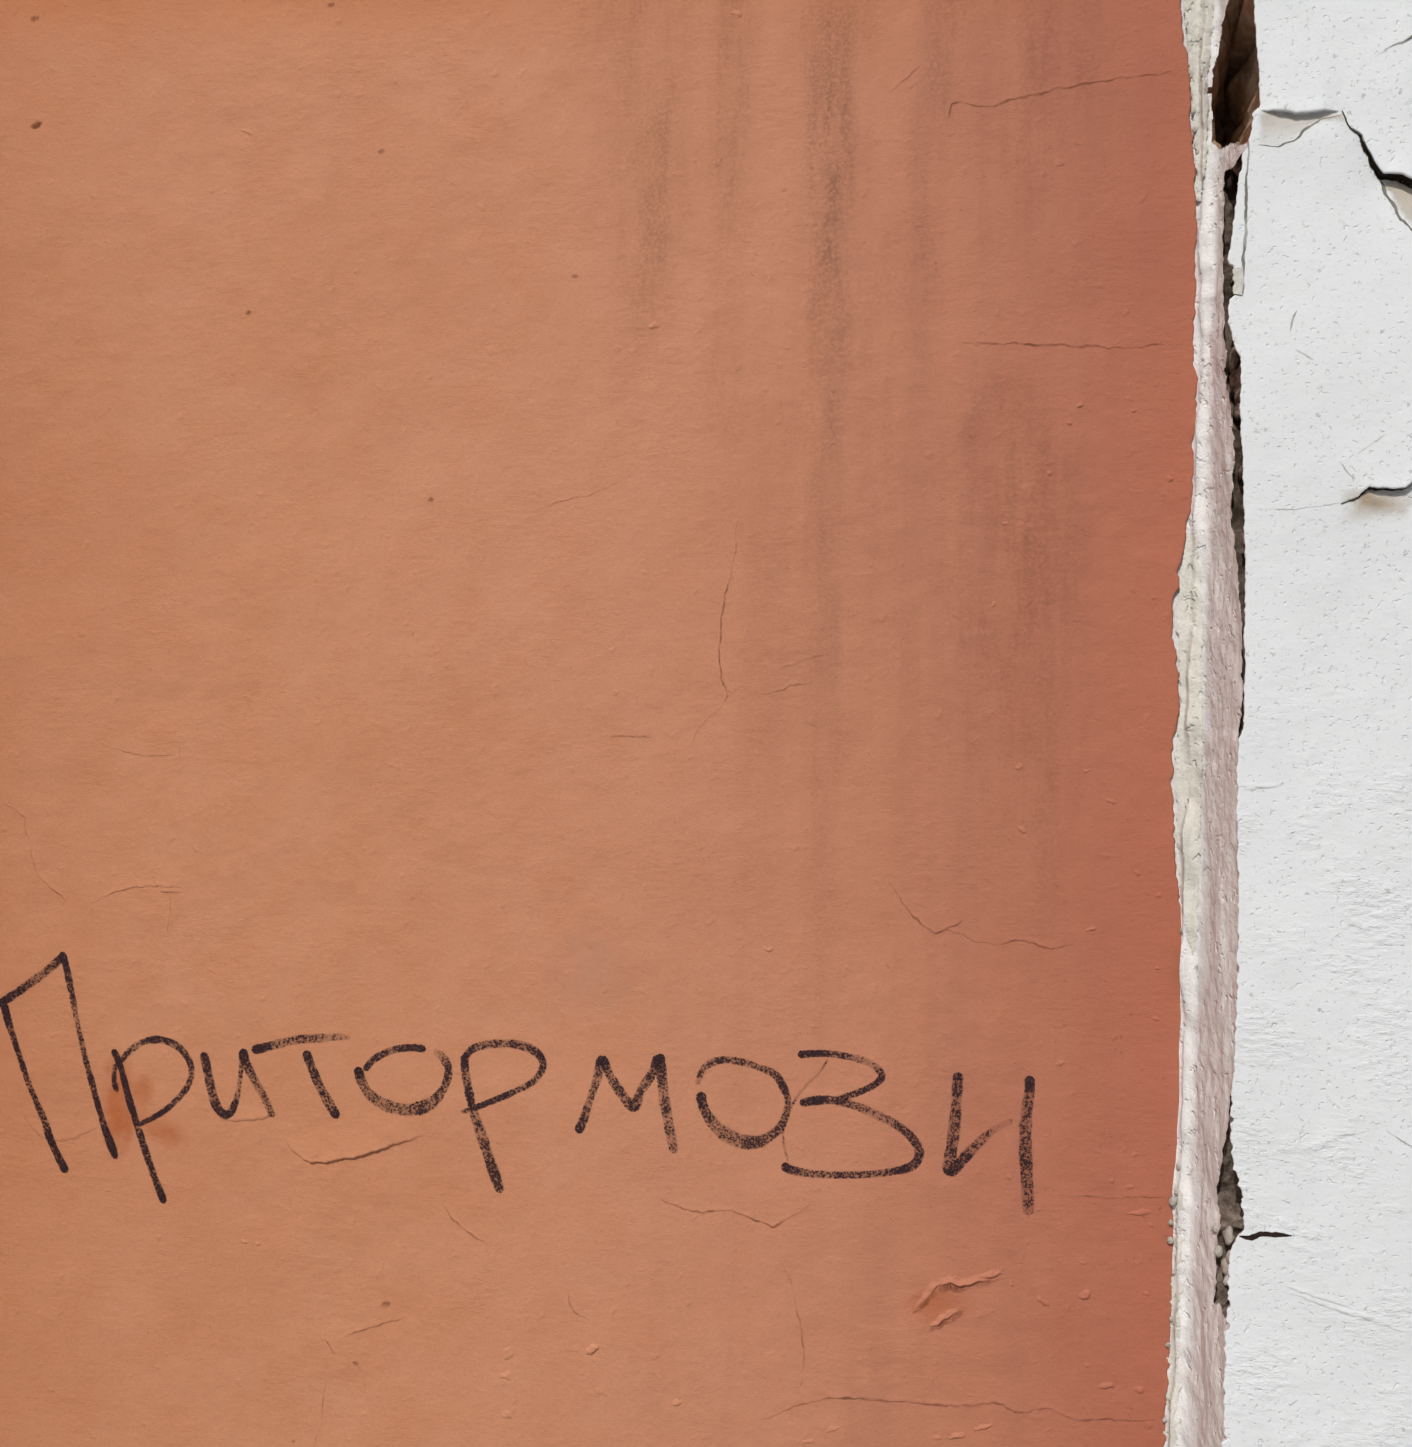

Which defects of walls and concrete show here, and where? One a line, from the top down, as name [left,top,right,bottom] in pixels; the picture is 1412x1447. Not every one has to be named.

crack [946,70,1189,115]
spalling [1183,0,1412,231]
crack [1222,141,1249,738]
peeling [1341,459,1412,508]
spalling [912,1269,1003,1328]
crack [780,1392,1131,1421]